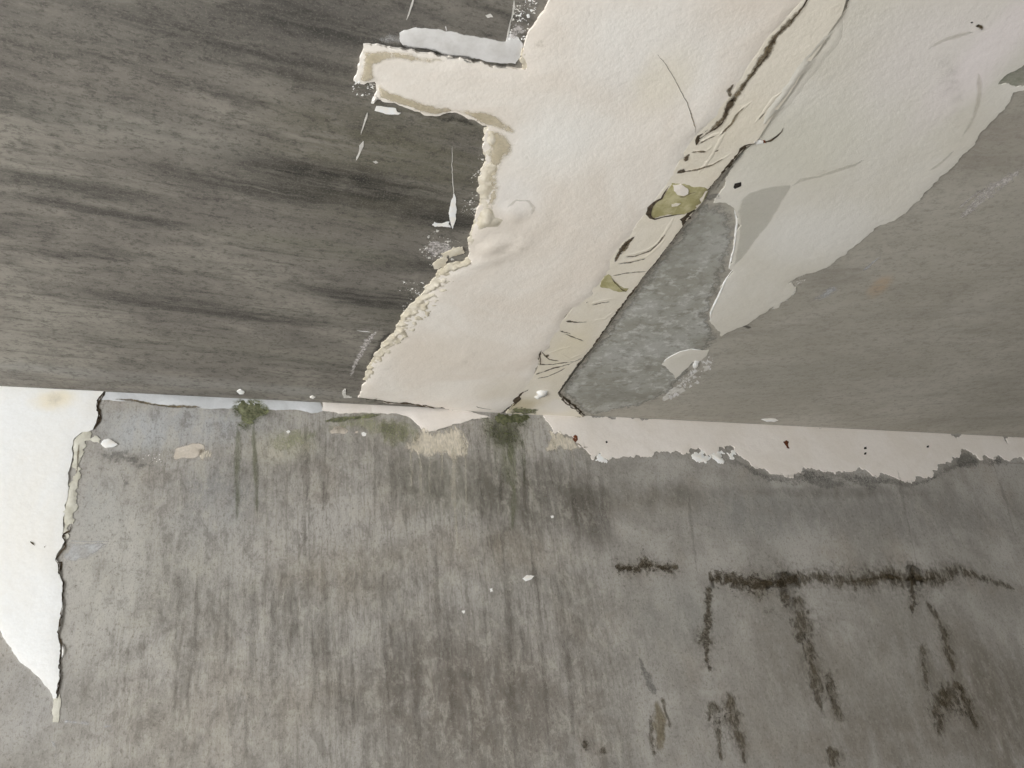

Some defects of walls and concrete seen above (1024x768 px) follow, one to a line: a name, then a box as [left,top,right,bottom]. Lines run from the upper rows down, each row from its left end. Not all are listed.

crack [476,0,846,417]
peeling [353,0,1024,484]
water stain [407,426,468,458]
peeling [0,386,118,722]
mould [615,556,678,573]
water stain [708,697,746,763]
water stain [699,565,1014,733]